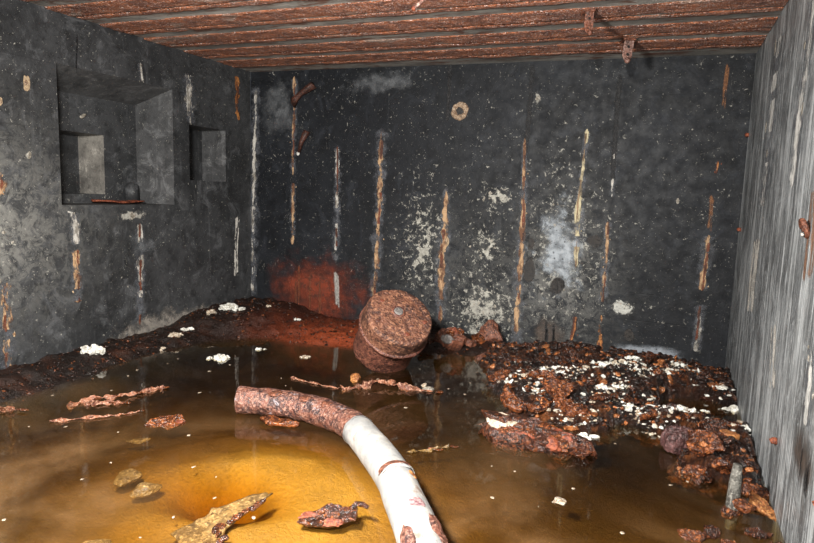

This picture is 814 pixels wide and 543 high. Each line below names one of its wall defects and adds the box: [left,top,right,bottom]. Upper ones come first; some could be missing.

rust [276,266,346,316]
leakage [523,203,606,293]
rust [803,193,814,279]